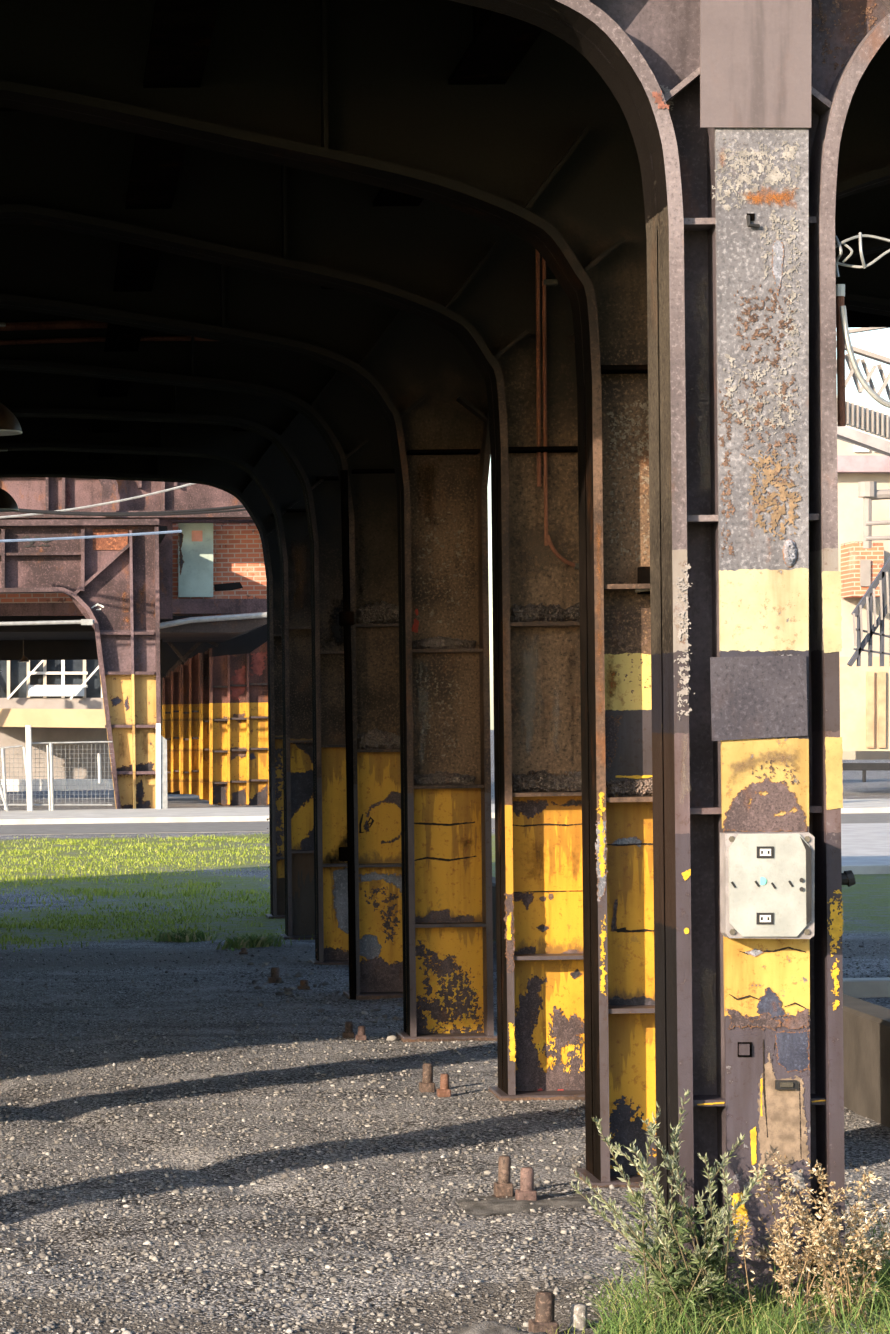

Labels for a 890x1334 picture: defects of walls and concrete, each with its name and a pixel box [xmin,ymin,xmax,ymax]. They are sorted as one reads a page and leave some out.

peeling [712,134,800,212]
rust [746,190,793,205]
rust [734,285,794,368]
rust [734,375,802,541]
peeling [673,563,695,721]
peeling [213,783,268,806]
peeling [723,777,807,833]
peeling [315,867,484,1034]
peeling [503,892,554,973]
peeling [512,769,655,1006]
peeling [508,974,585,1091]
peeling [727,987,810,1191]